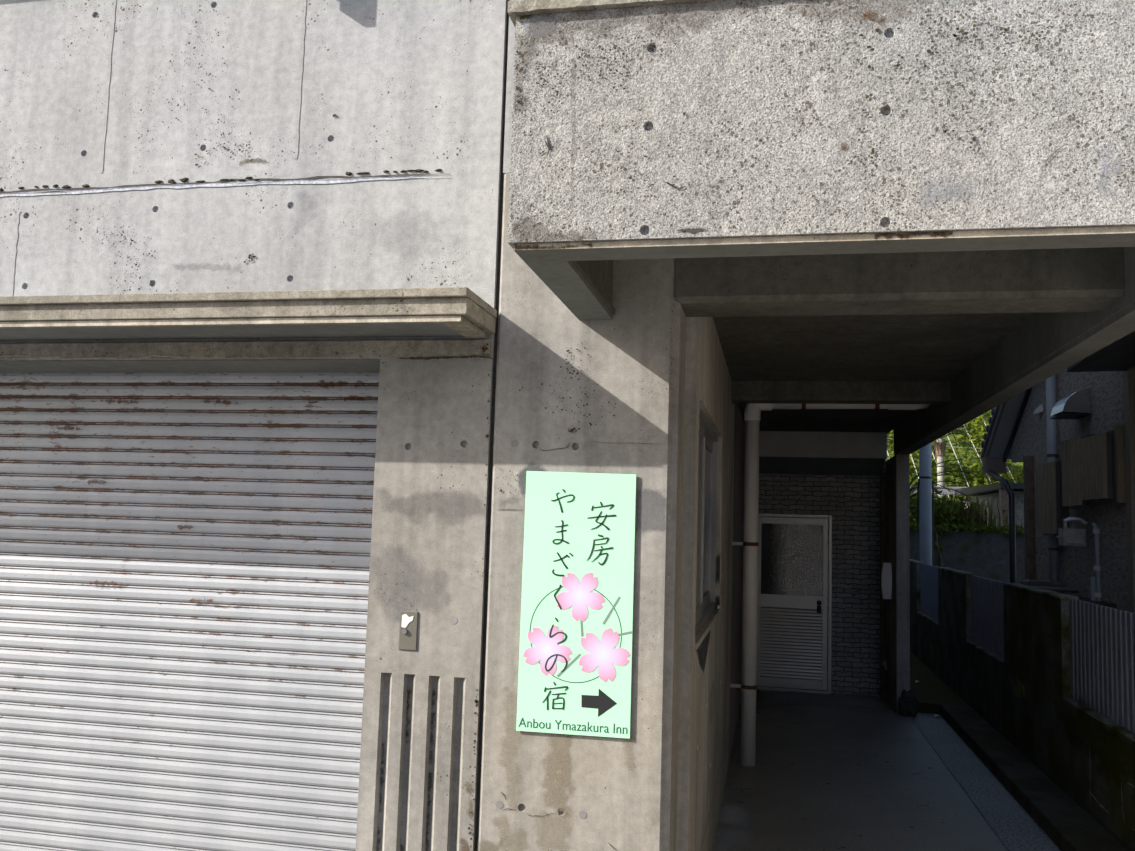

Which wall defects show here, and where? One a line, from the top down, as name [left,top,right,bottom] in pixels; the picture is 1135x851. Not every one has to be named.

crack [0,169,446,197]
rust [317,381,368,401]